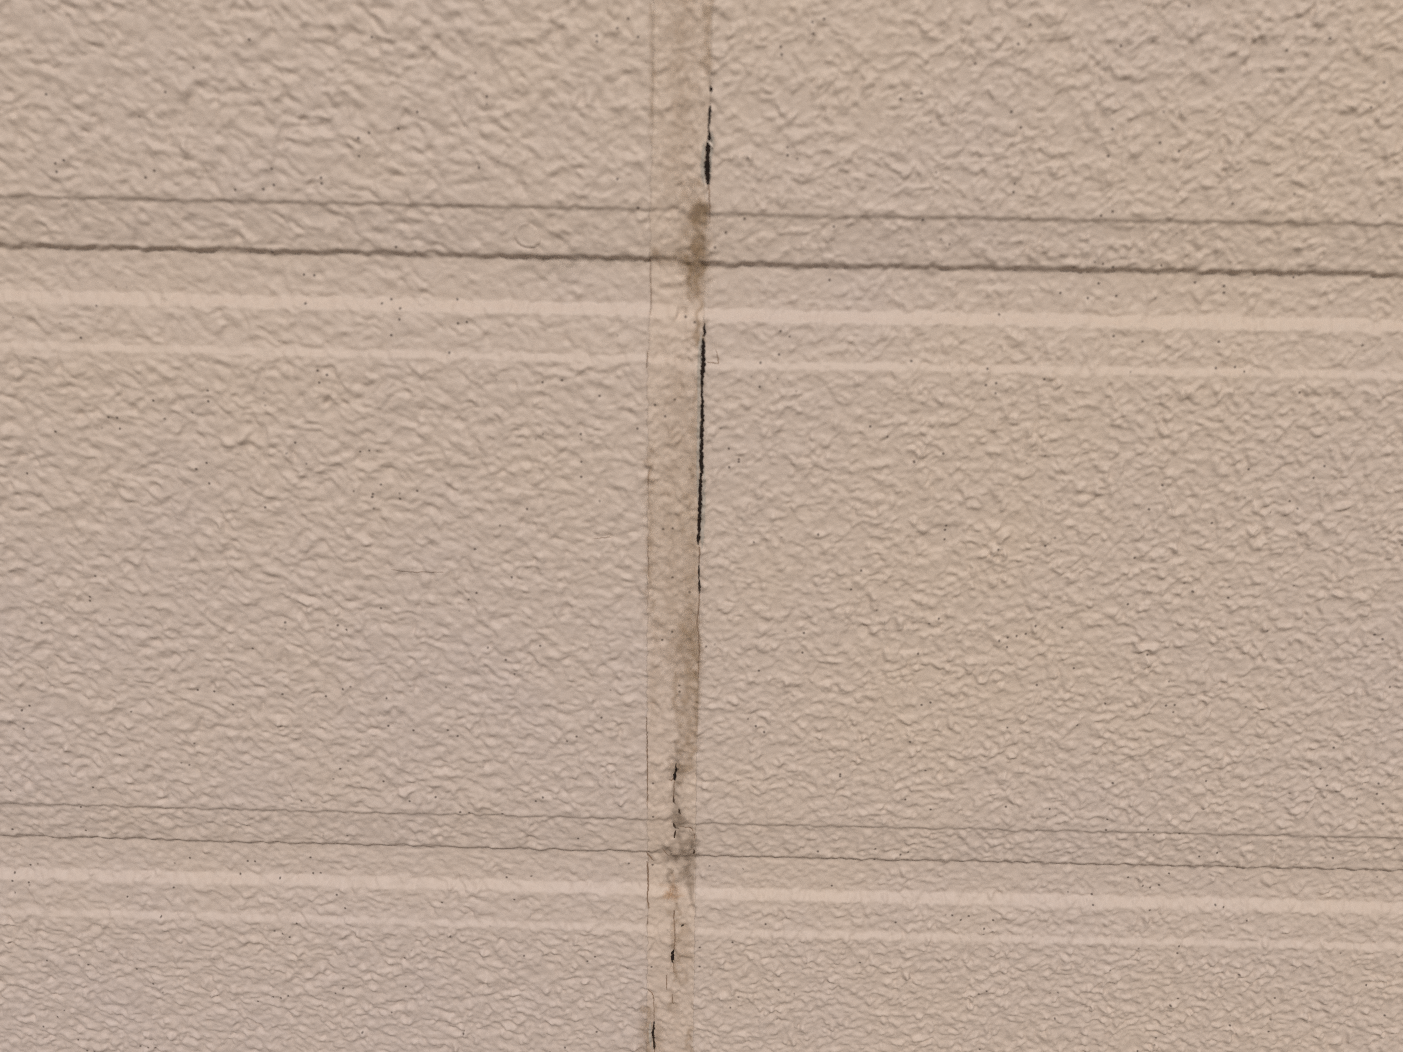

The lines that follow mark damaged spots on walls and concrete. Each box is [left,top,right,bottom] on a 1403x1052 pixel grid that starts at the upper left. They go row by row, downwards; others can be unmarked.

crack [700,86,715,224]
crack [696,323,719,678]
crack [646,717,695,1052]